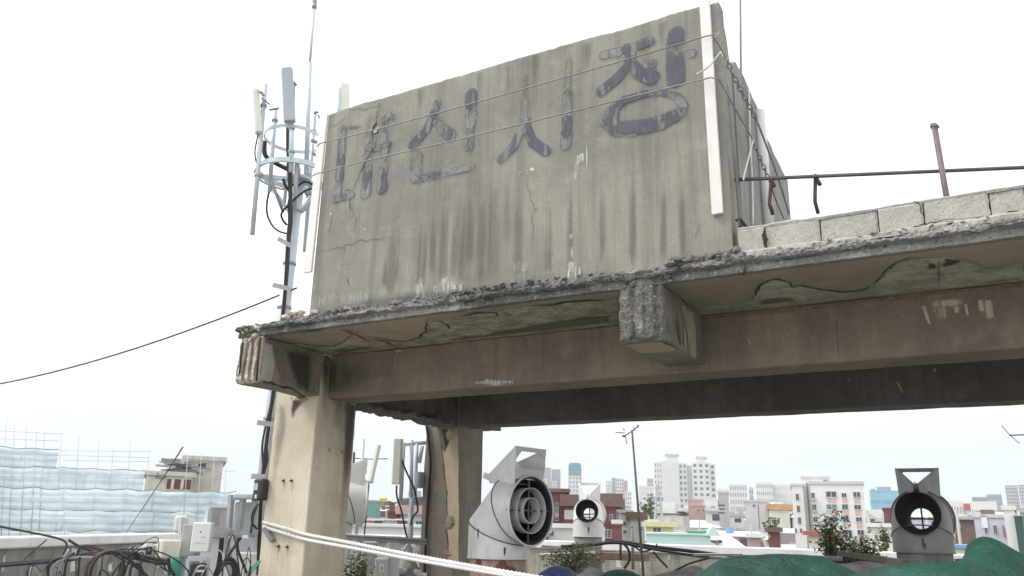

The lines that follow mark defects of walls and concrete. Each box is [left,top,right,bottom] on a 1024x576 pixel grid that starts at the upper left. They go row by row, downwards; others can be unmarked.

crack [317,102,390,253]
peeling [236,323,275,382]
spalling [281,272,604,320]
peeling [377,246,747,353]
peeling [681,257,1024,359]